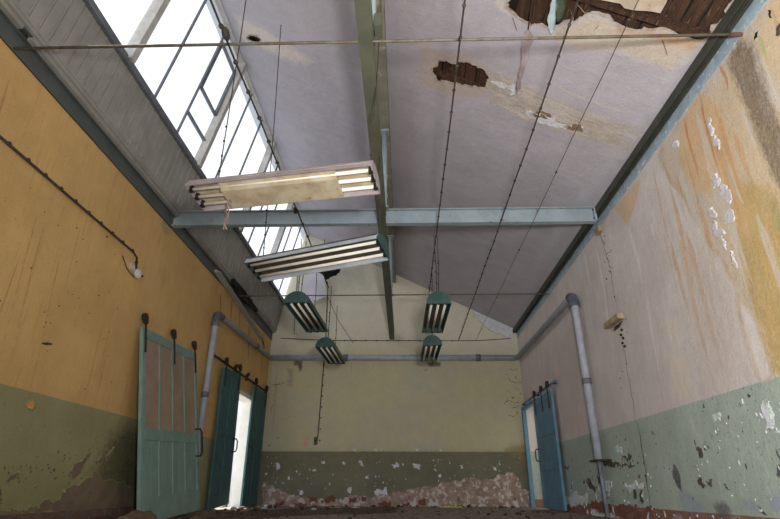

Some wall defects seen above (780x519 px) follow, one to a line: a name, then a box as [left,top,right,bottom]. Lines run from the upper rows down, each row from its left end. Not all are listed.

water stain [721,25,780,186]
peeling [0,440,137,519]
flaking render [261,449,531,507]
flaking render [566,436,674,519]
peeling [694,412,729,488]
peeling [755,399,780,434]